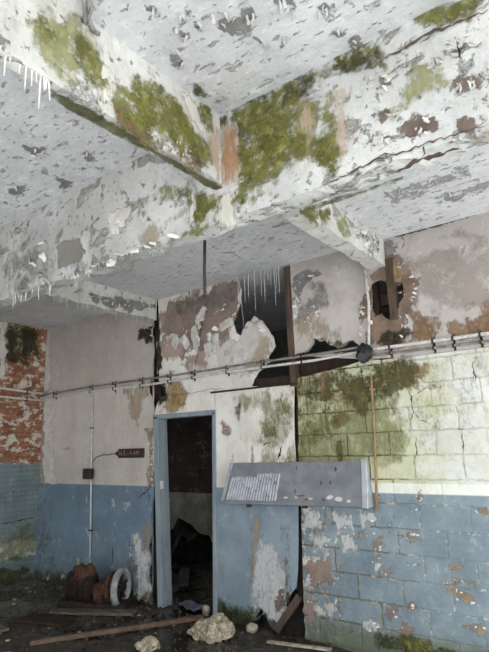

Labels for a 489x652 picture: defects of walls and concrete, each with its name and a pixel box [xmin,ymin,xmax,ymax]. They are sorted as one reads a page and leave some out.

crack [383,9,488,59]
leakage [96,63,120,103]
leakage [181,84,210,148]
rust [211,122,240,185]
peeling [363,109,439,148]
crack [313,123,489,190]
peeling [456,115,477,140]
peeling [58,233,179,283]
flaking render [354,219,420,350]
leakage [0,321,9,379]
flaking render [161,279,275,378]
crack [409,387,428,423]